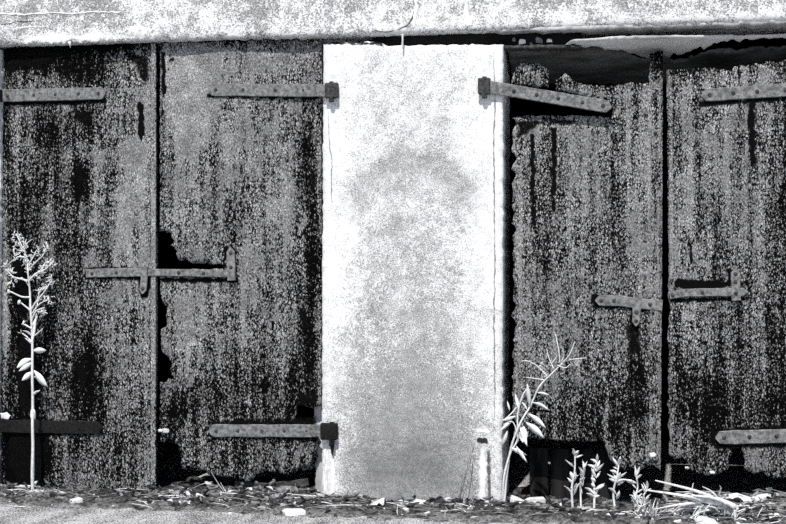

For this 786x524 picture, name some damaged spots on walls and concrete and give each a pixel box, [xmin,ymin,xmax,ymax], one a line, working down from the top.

crack [0,11,129,30]
corrosion [4,98,107,126]
corrosion [137,102,145,141]
corrosion [699,97,786,166]
corrosion [516,118,576,226]
corrosion [11,237,33,320]
corrosion [83,266,151,298]
corrosion [660,268,749,303]
corrosion [591,294,650,354]
corrosion [10,331,61,421]
corrosion [6,433,76,485]
corrosion [709,424,786,449]